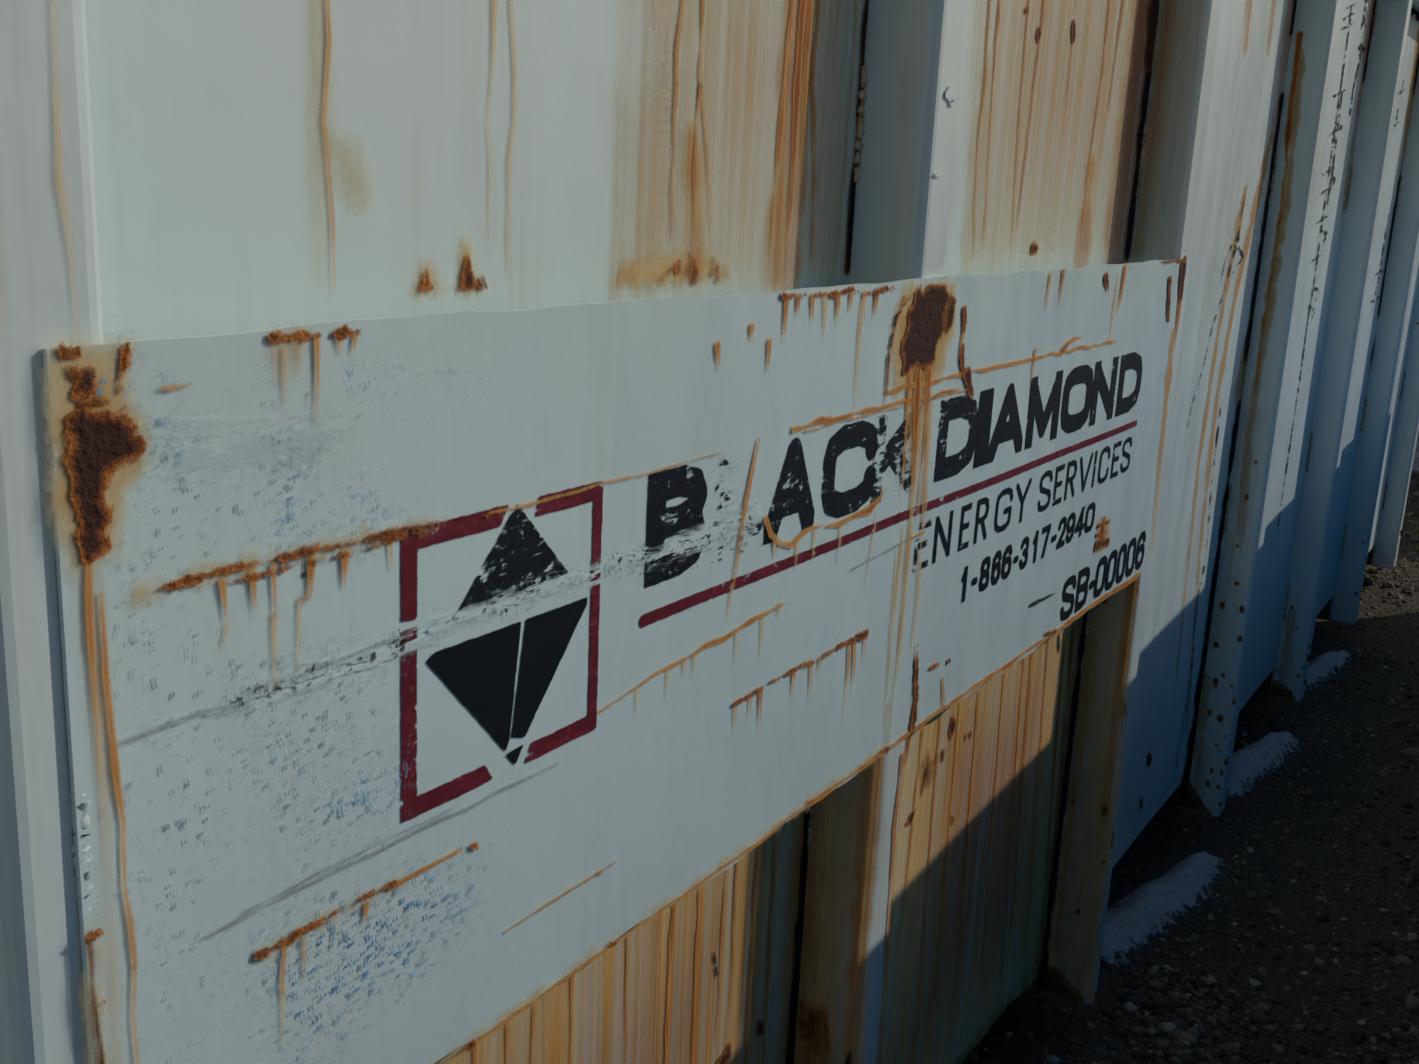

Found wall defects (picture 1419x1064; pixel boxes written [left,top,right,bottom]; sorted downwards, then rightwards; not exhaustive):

corrosion [269,324,360,394]
corrosion [322,0,334,239]
corrosion [419,269,438,293]
corrosion [459,246,487,292]
corrosion [619,0,727,285]
corrosion [768,0,821,263]
corrosion [974,0,1001,215]
corrosion [1013,0,1046,214]
corrosion [1196,0,1305,499]
corrosion [48,342,146,1064]
corrosion [436,281,1141,1064]
corrosion [1168,672,1236,820]